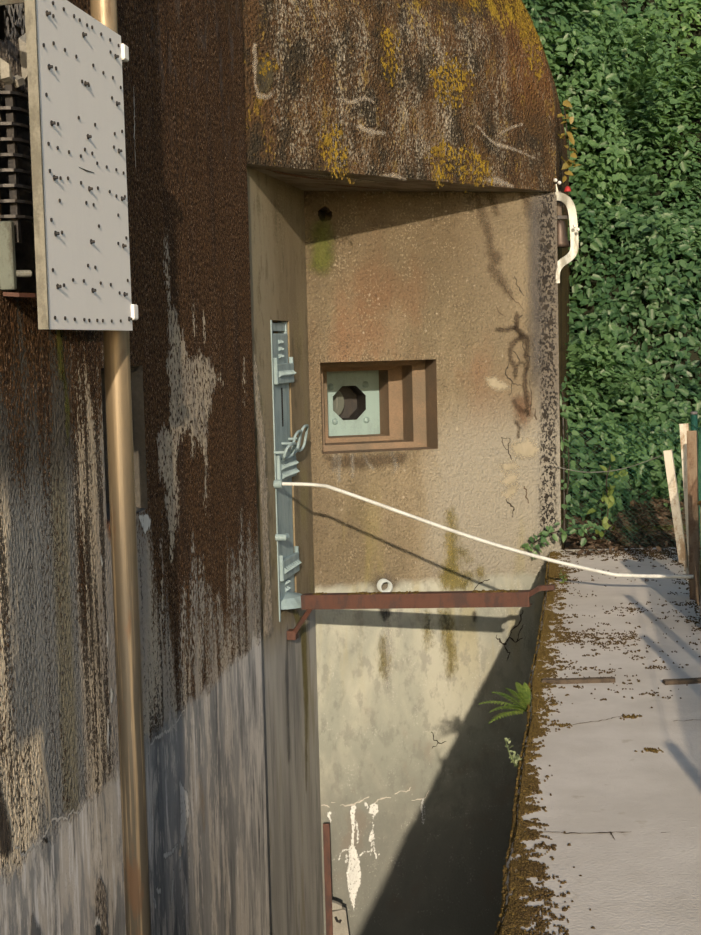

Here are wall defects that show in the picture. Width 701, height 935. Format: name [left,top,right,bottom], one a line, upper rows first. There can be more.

damp [479,208,508,292]
crack [495,276,537,460]
crack [496,610,523,660]
damp [0,781,12,859]
efflorescence [338,802,380,909]